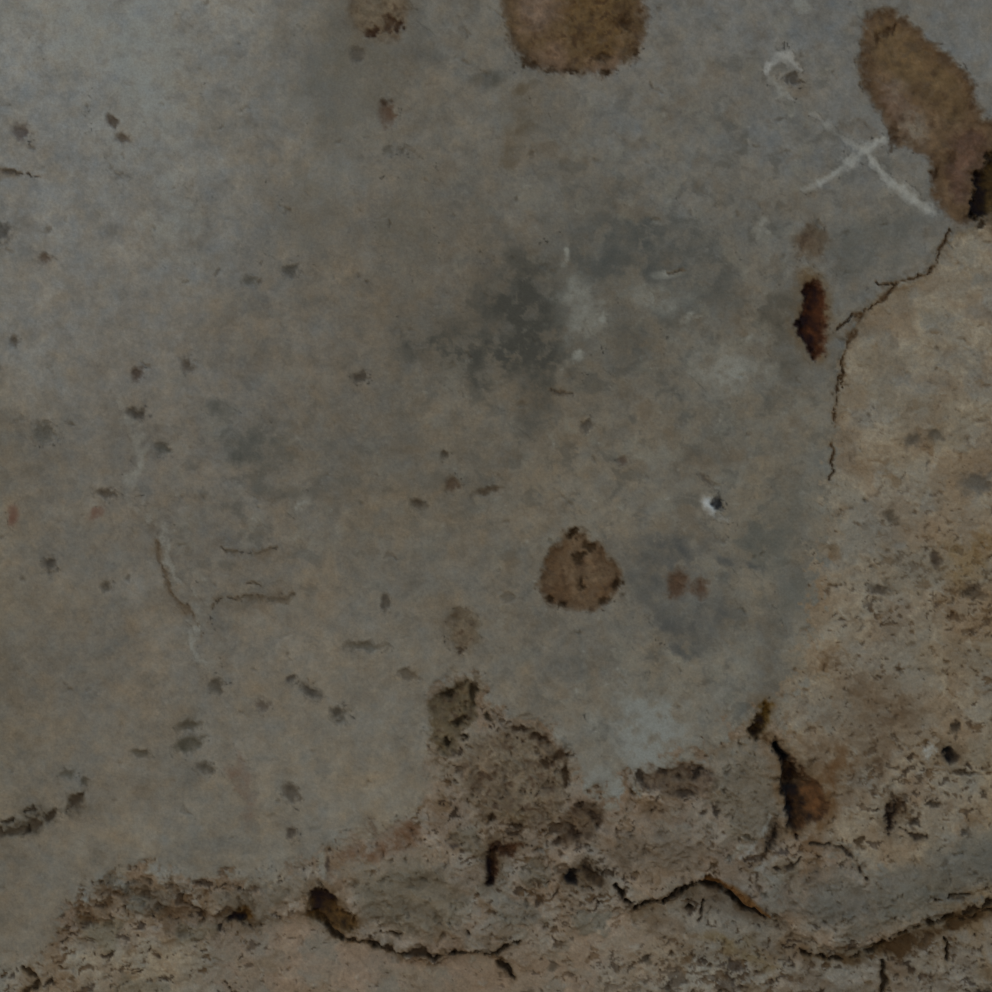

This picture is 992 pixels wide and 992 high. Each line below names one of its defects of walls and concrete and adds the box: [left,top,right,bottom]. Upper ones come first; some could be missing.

spalling [346,0,414,66]
spalling [500,0,651,81]
crack [829,231,952,481]
spalling [757,7,992,871]
peeling [697,473,740,527]
spalling [534,527,629,615]
spalling [665,566,712,603]
spalling [0,668,882,992]
crack [614,859,779,924]
crack [322,923,523,980]
crack [799,887,992,992]
spalling [885,924,992,992]